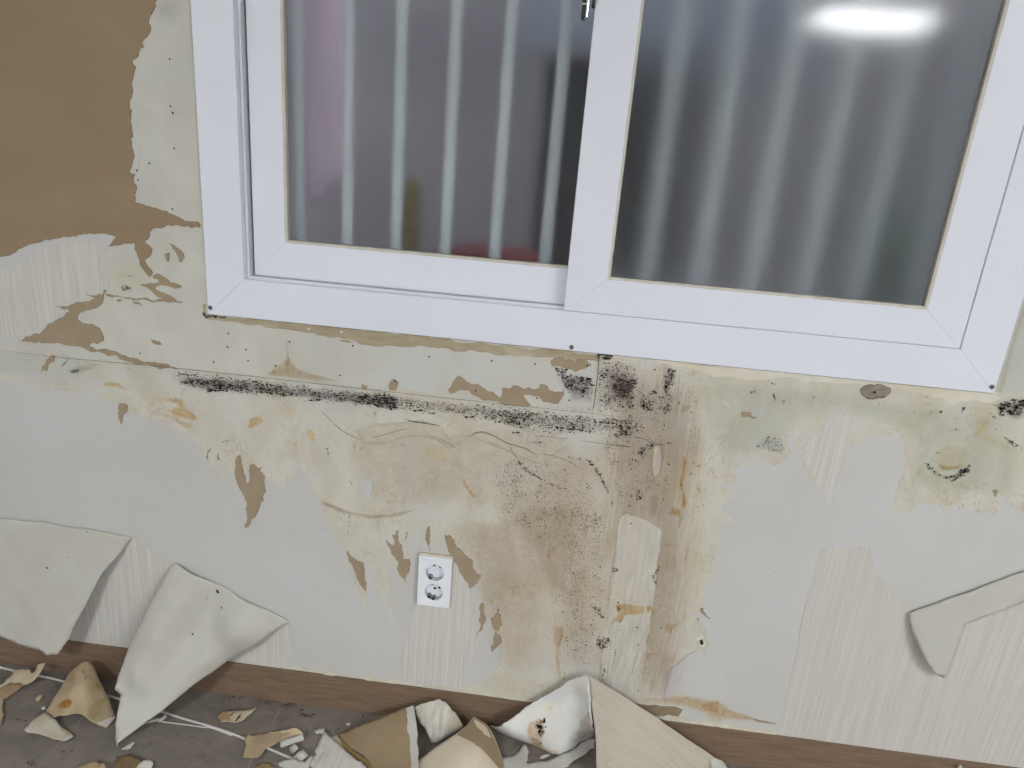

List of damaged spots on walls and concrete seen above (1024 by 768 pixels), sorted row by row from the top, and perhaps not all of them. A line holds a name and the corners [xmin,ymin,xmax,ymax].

flaking render [55,0,598,413]
damp [174,362,676,665]
peeling [0,308,1024,706]
damp [998,397,1024,416]